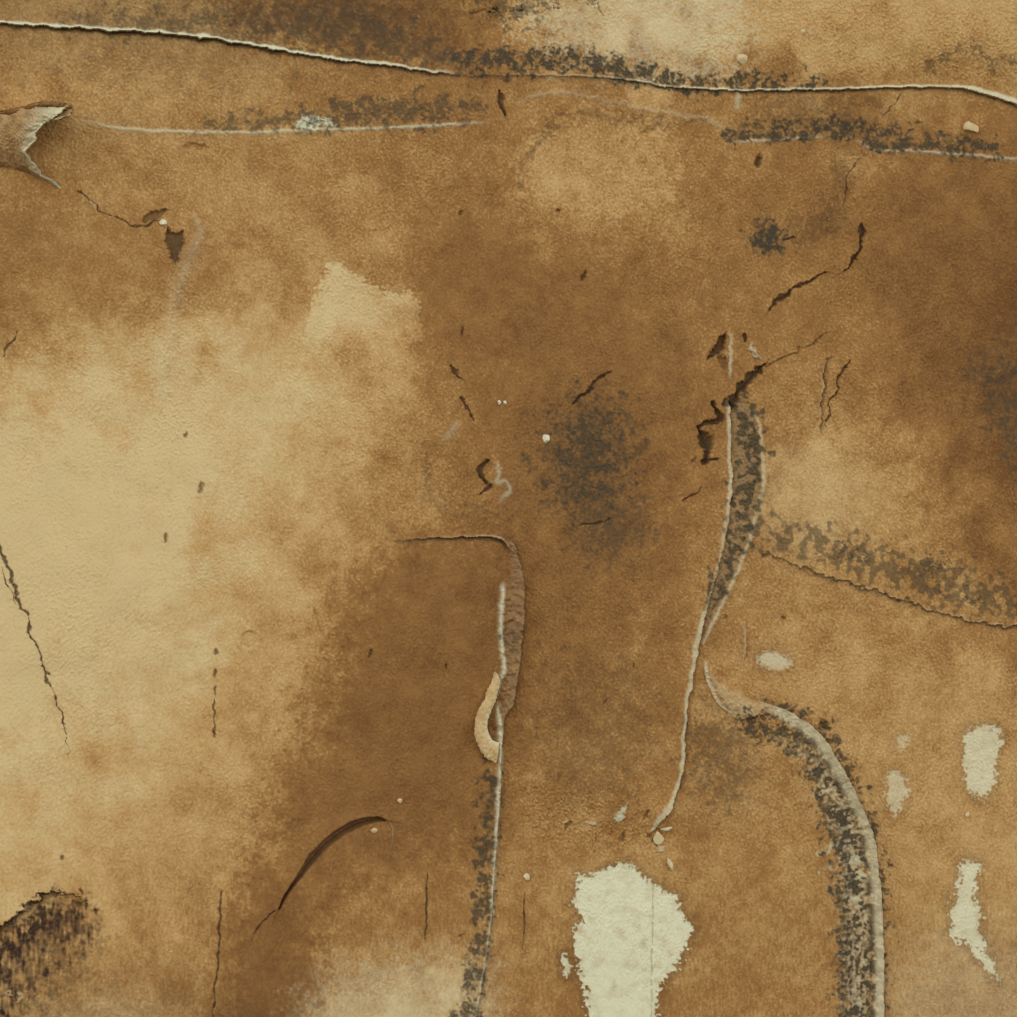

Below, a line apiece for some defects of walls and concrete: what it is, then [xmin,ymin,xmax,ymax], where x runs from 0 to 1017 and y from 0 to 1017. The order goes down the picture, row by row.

peeling [0,20,458,77]
peeling [0,101,490,189]
crack [495,89,508,118]
crack [767,156,870,314]
crack [681,331,851,503]
crack [0,542,71,756]
peeling [402,391,885,1017]
peeling [959,722,1006,803]
spalling [0,854,125,1017]
crack [210,890,224,1017]
crack [250,815,394,948]
peeling [946,855,1003,986]